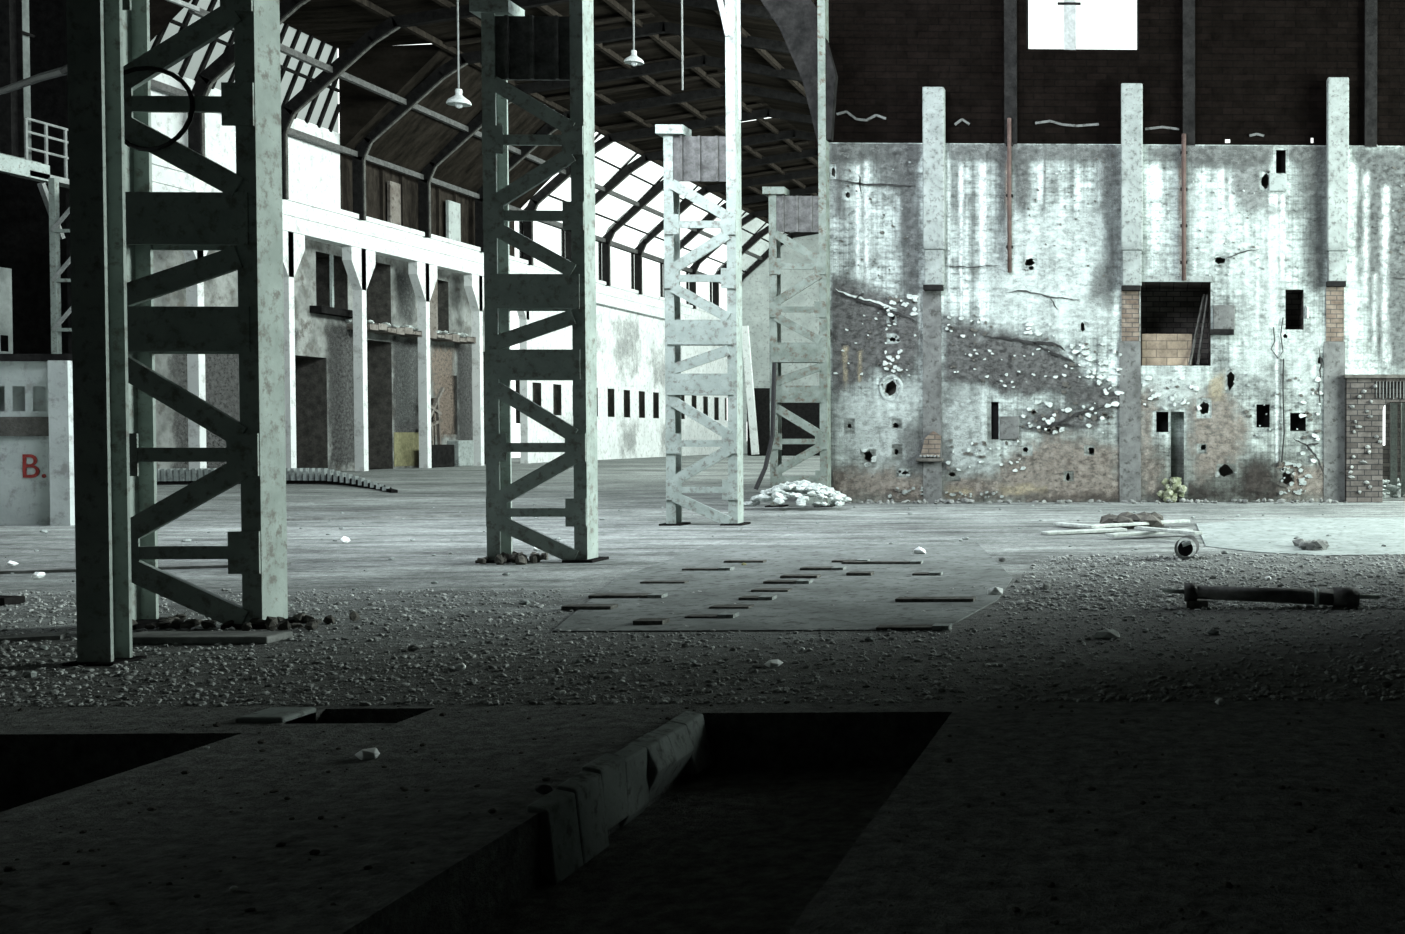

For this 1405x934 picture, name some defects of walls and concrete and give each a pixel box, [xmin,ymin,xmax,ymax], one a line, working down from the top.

leakage [947,147,1043,329]
leakage [1349,146,1405,369]
spalling [834,294,919,396]
spalling [861,447,877,467]
peeling [888,449,924,499]